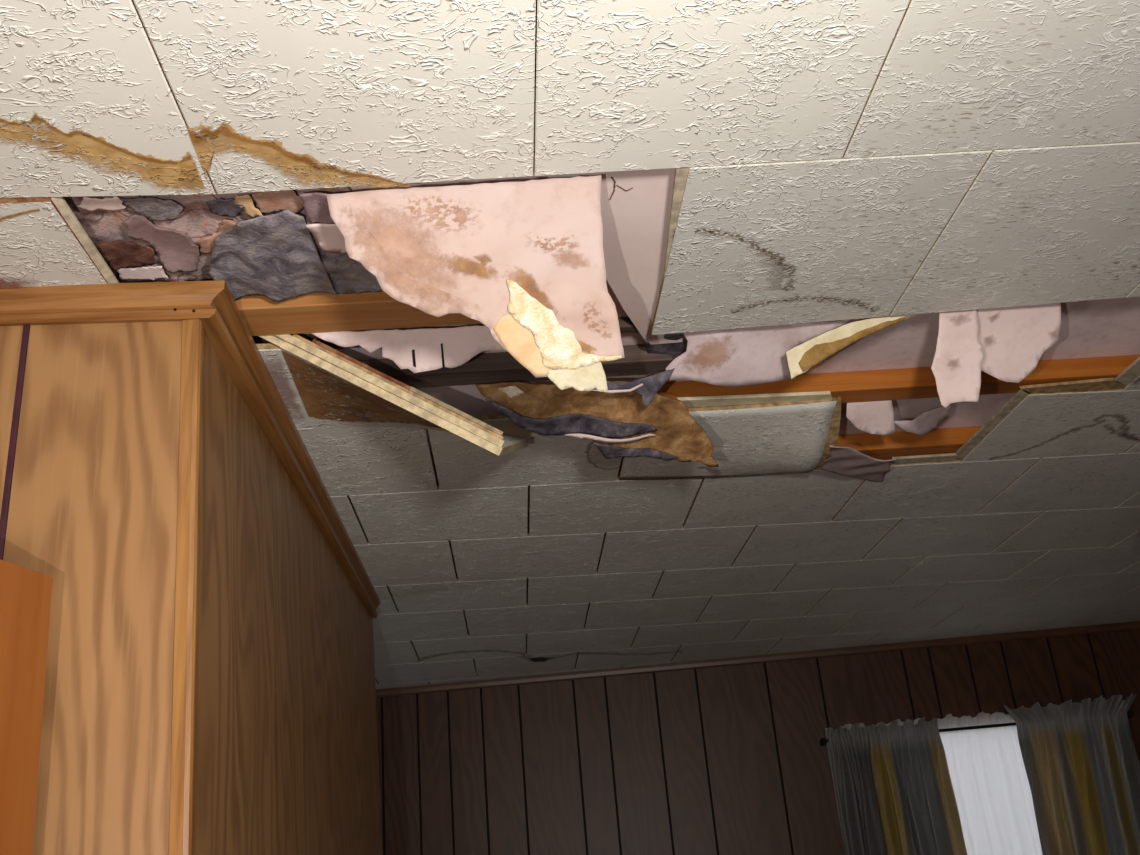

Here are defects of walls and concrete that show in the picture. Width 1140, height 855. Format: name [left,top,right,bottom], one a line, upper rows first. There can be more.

water stain [0,114,411,189]
peeling [77,190,304,281]
peeling [306,223,347,254]
water stain [0,279,23,289]